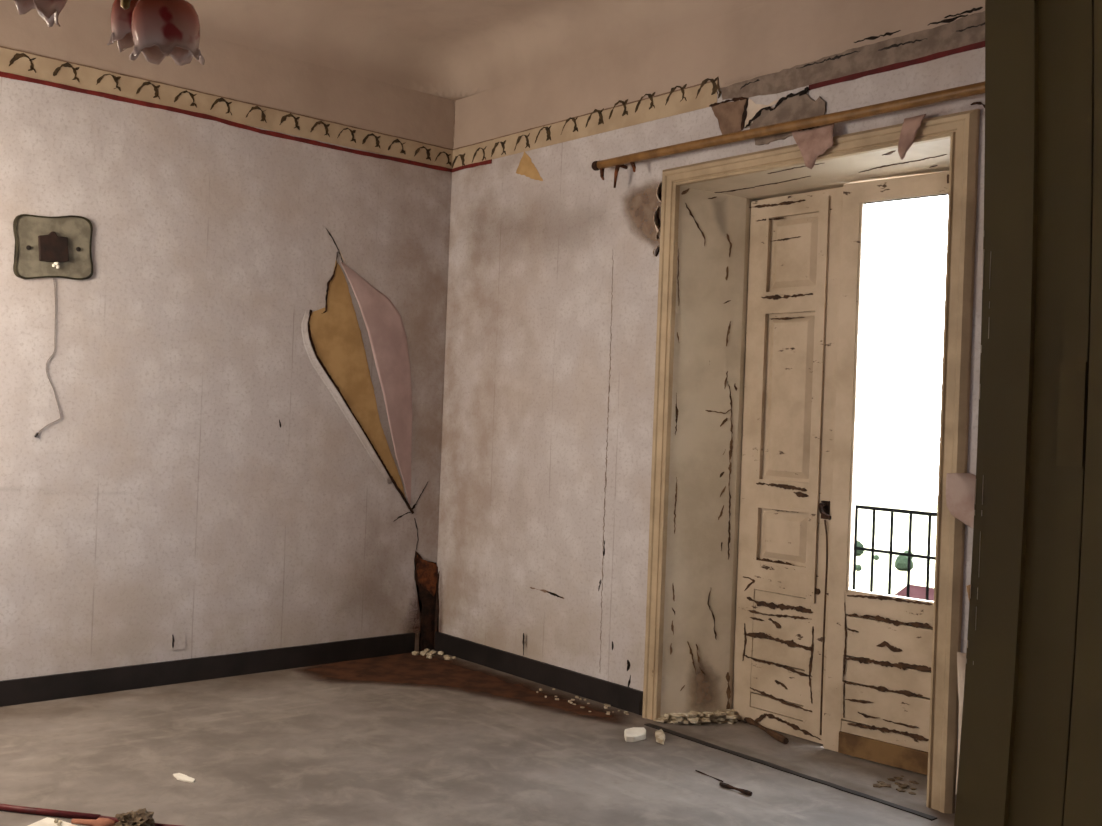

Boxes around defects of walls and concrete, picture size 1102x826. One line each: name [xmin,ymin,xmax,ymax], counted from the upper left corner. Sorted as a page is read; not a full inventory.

spalling [928,7,985,32]
spalling [800,30,924,68]
peeling [516,152,543,181]
flaking render [309,261,406,498]
peeling [756,482,808,497]
spalling [409,551,441,651]
peeling [742,576,814,712]
peeling [843,595,933,741]
peeling [750,713,821,740]